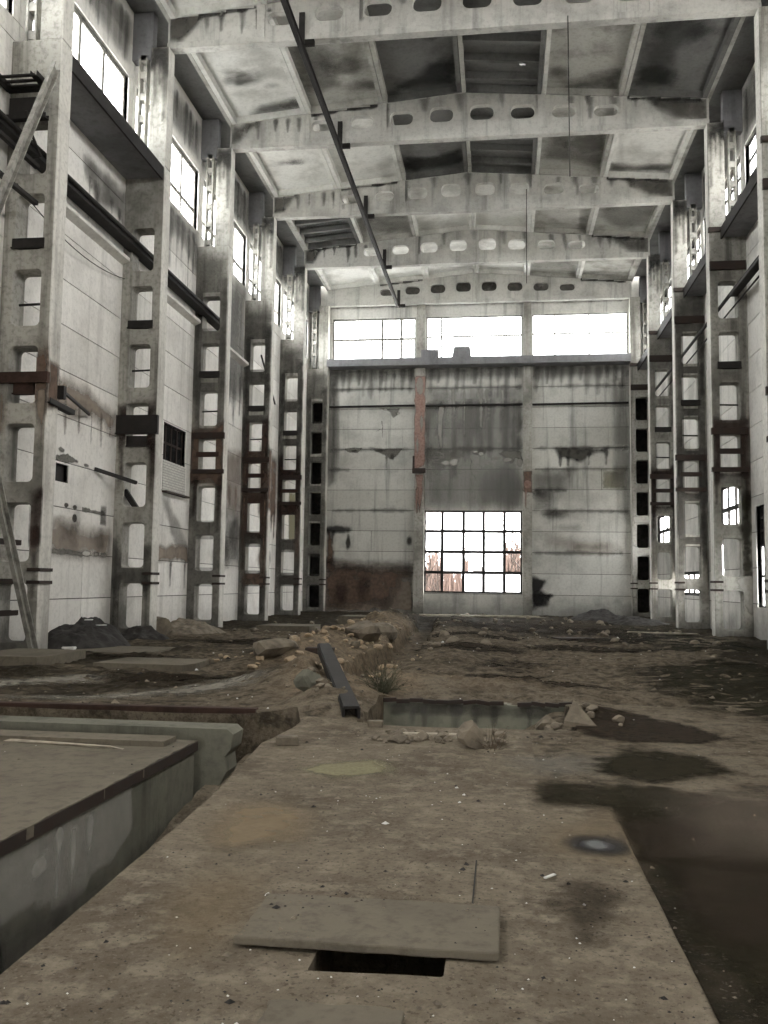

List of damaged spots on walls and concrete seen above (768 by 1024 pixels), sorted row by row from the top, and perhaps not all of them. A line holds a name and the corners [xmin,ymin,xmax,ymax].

damp [646,20,700,84]
damp [150,6,463,313]
damp [225,283,413,612]
damp [427,388,520,504]
damp [556,448,608,466]
damp [52,507,188,626]
damp [532,577,553,610]